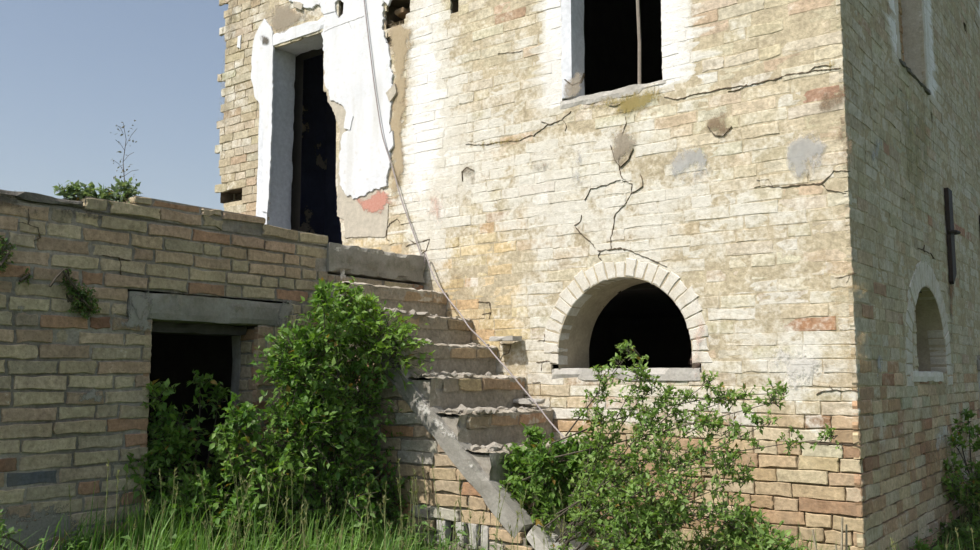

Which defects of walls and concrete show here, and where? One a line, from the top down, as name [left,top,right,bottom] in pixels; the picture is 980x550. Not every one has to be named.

crack [665,65,840,100]
peeling [237,0,413,238]
crack [471,111,571,145]
hole [220,188,243,204]
crack [574,158,667,267]
crack [754,170,850,192]